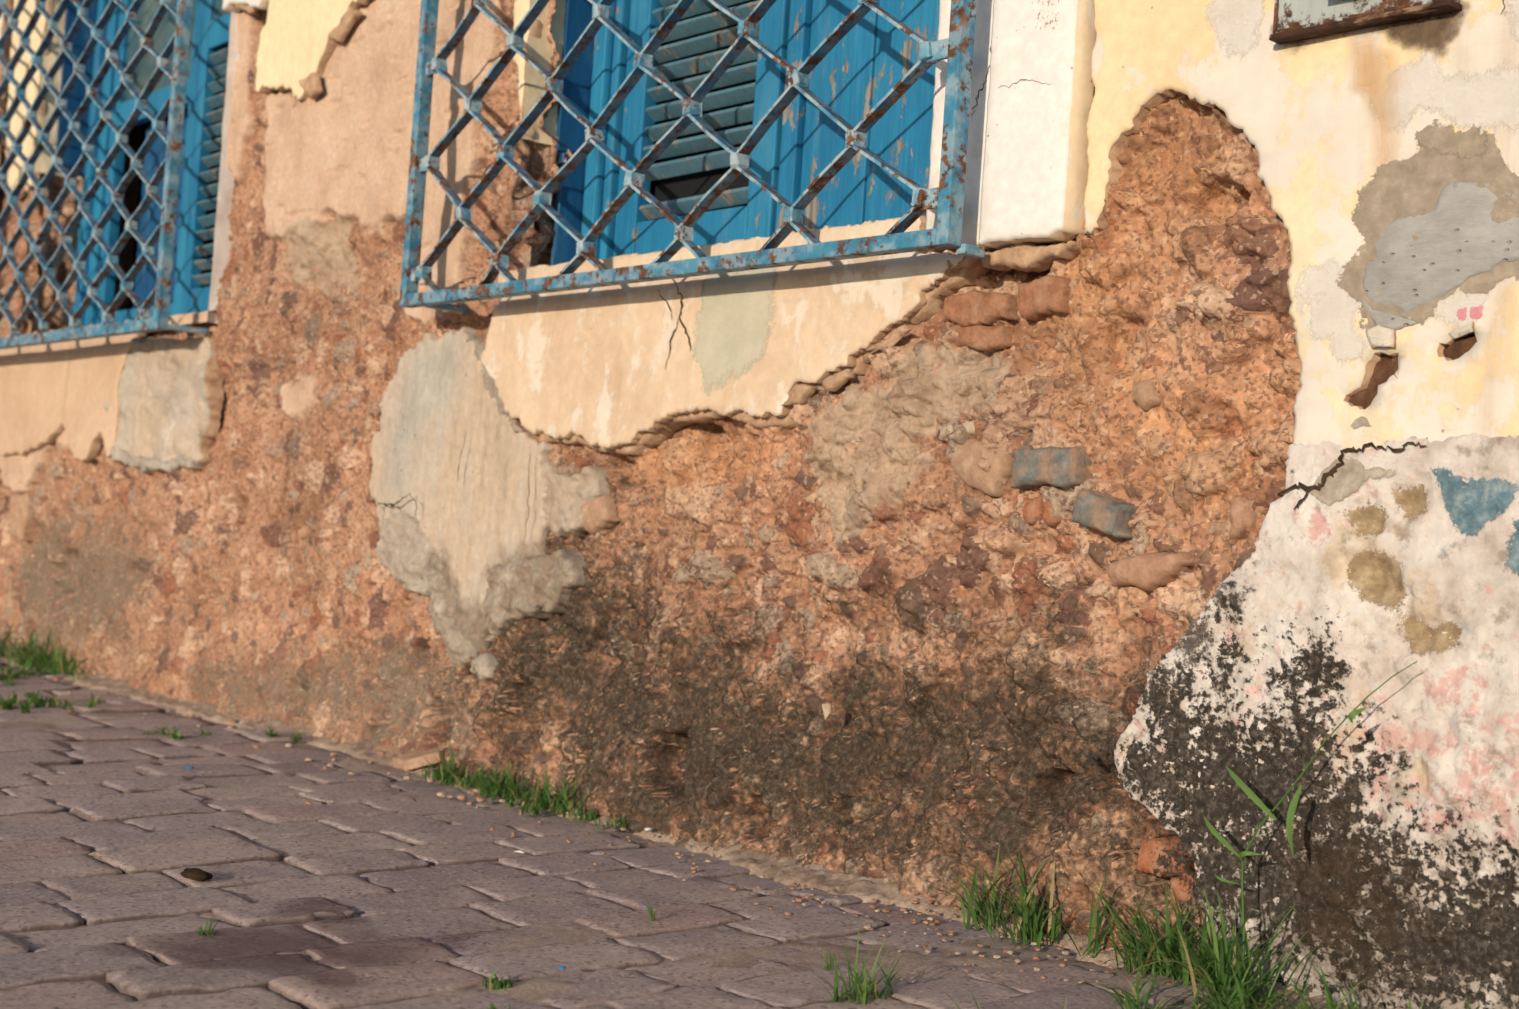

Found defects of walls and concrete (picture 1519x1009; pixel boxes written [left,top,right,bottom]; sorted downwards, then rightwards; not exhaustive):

spalling [0,0,501,752]
spalling [418,0,555,293]
spalling [546,0,560,75]
crack [657,279,691,368]
spalling [389,94,1302,954]
peeling [1206,0,1264,57]
crack [1277,442,1426,509]
spalling [1348,354,1398,409]
peeling [1295,51,1519,360]
damp [178,521,1519,1009]